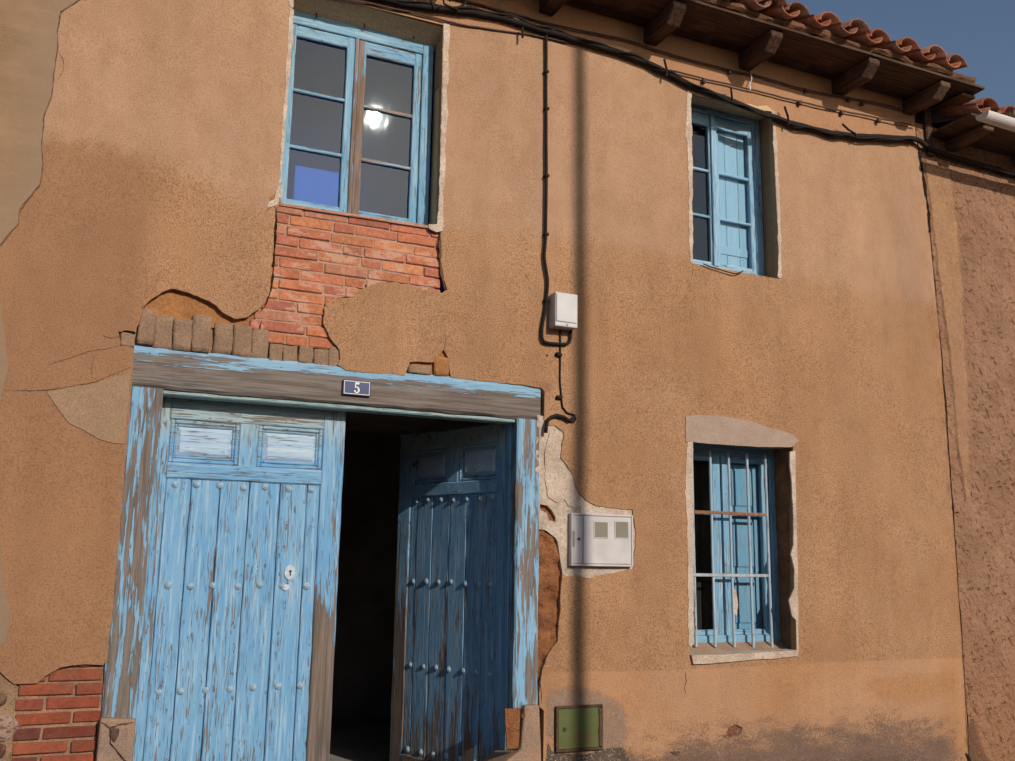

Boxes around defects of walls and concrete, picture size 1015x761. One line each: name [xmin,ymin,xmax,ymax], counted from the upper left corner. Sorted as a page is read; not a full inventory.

flaking render [144,0,450,349]
crack [8,336,130,391]
flaking render [535,415,636,680]
flaking render [12,663,119,761]
damp [549,690,961,761]